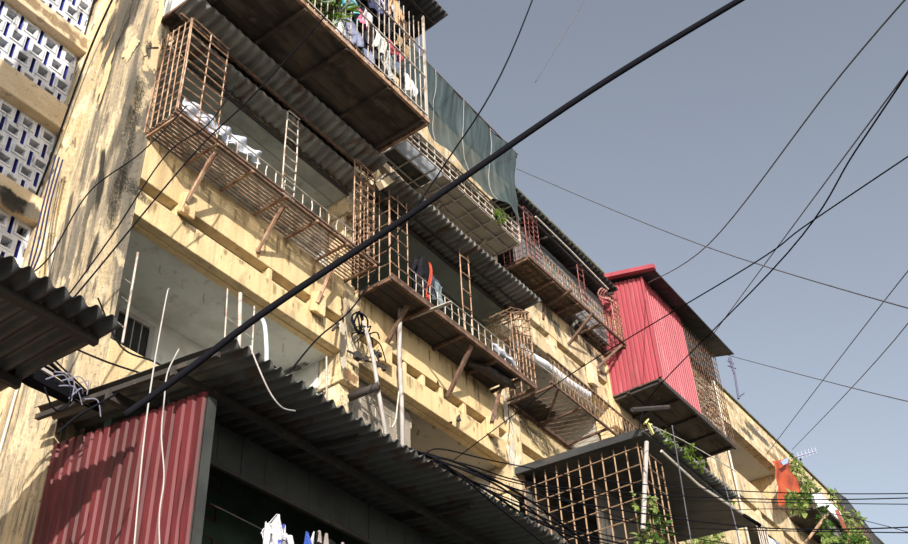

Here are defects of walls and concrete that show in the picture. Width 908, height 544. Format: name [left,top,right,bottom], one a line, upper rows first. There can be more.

leakage [26,0,86,47]
leakage [100,0,140,63]
leakage [0,185,40,220]
leakage [74,71,150,272]
leakage [55,195,72,283]